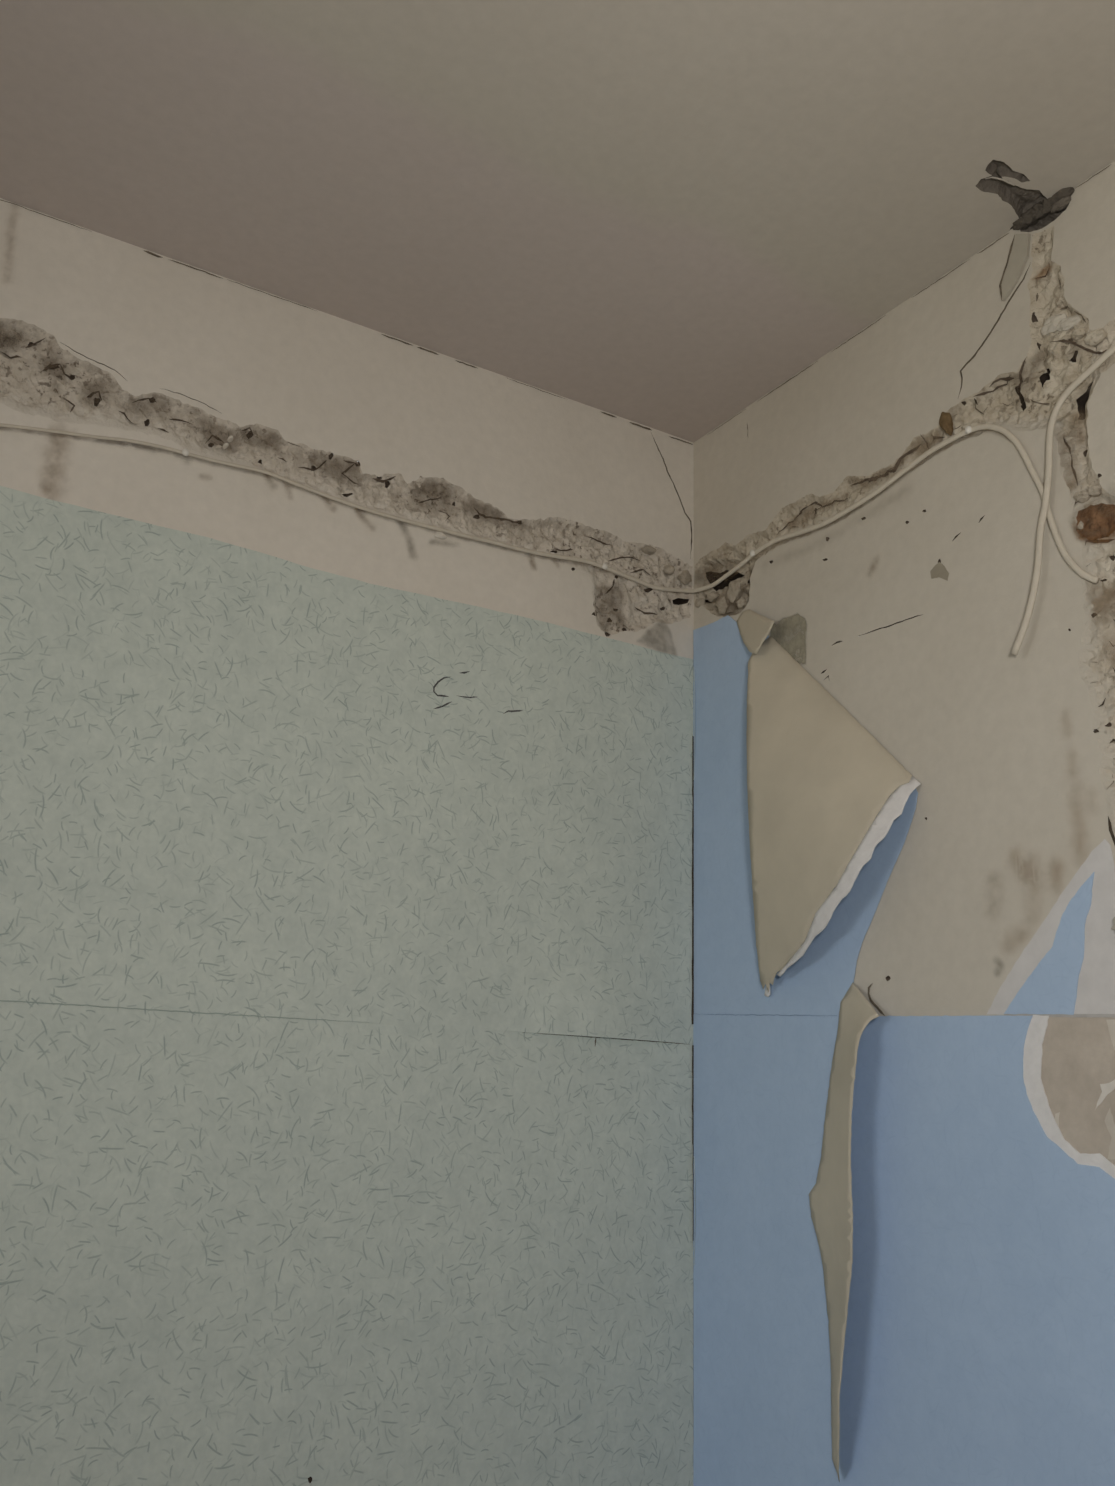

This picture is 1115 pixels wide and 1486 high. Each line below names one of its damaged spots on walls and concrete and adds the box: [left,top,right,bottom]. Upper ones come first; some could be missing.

flaking render [0,160,1115,836]